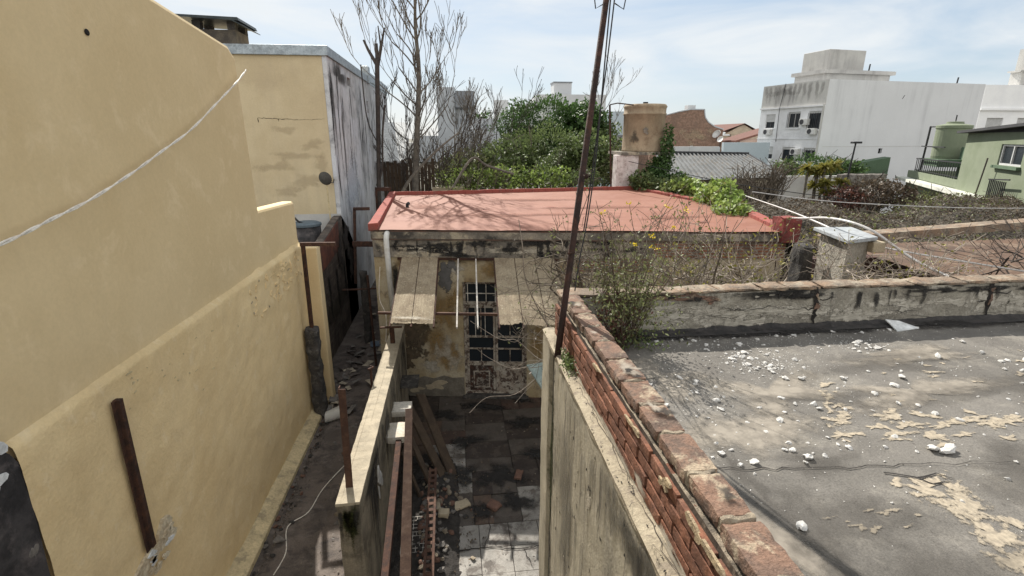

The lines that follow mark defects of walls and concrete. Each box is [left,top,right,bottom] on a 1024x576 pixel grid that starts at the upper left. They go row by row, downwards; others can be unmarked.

damp [329,65,382,193]
damp [629,294,705,302]
crack [671,287,833,324]
damp [739,286,834,300]
damp [854,285,1024,309]
crack [889,283,1011,318]
damp [429,290,459,369]
peeling [818,382,1024,449]
peeling [825,508,901,533]
peeling [890,470,1024,573]
flaking render [134,515,177,576]